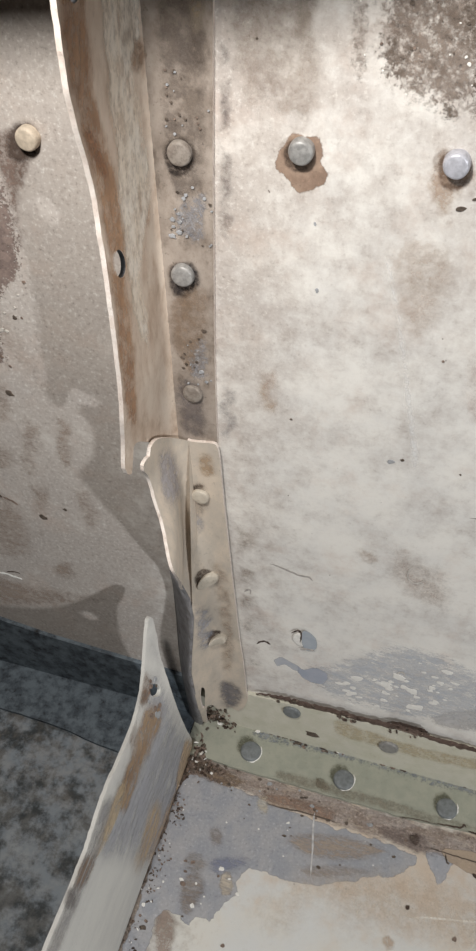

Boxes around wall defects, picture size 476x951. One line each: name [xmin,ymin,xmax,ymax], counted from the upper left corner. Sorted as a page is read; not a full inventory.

peeling [122,771,476,951]